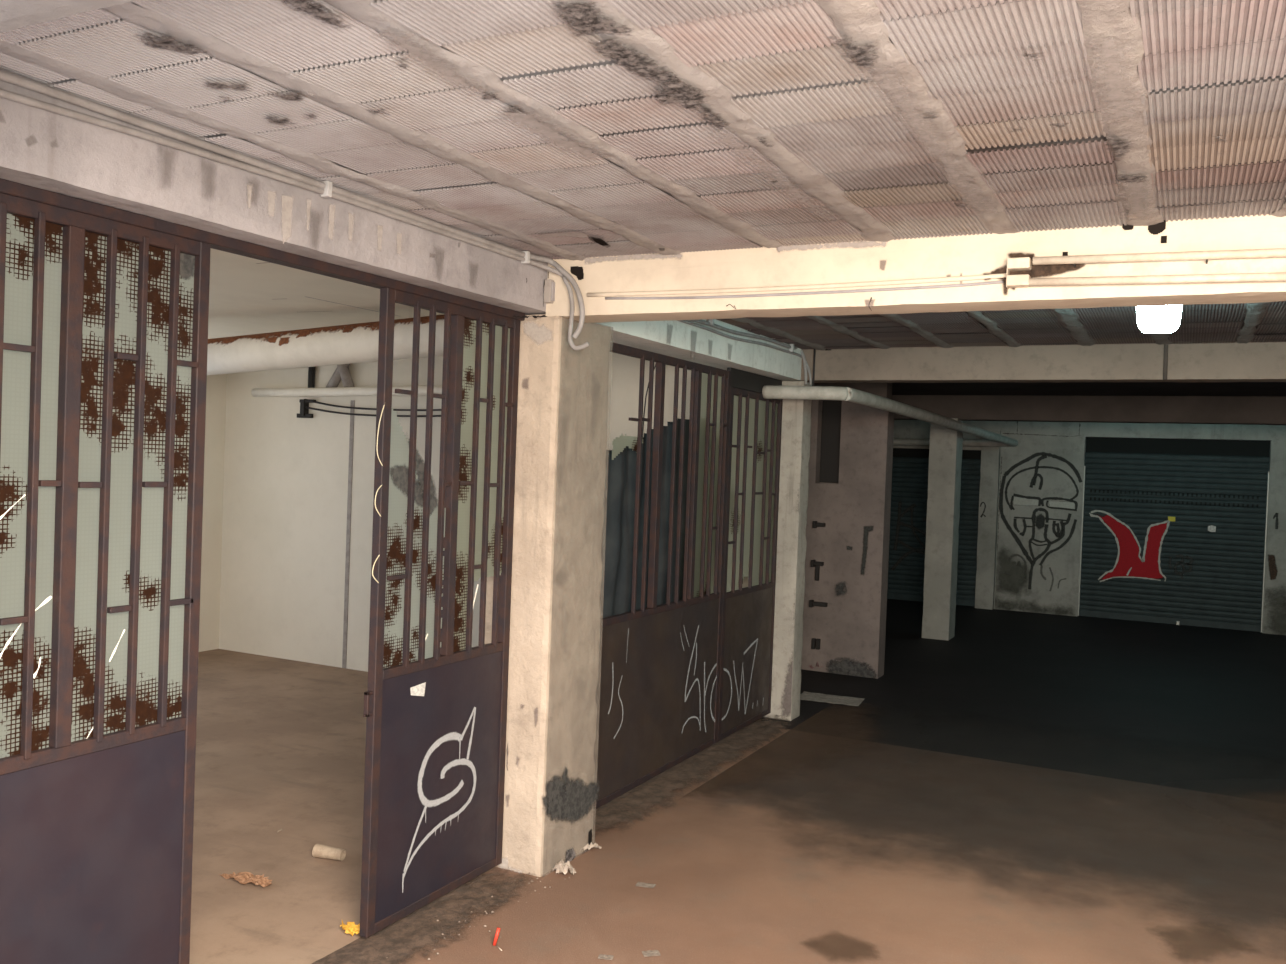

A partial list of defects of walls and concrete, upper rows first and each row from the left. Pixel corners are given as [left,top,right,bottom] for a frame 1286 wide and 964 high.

rust [208,314,444,346]